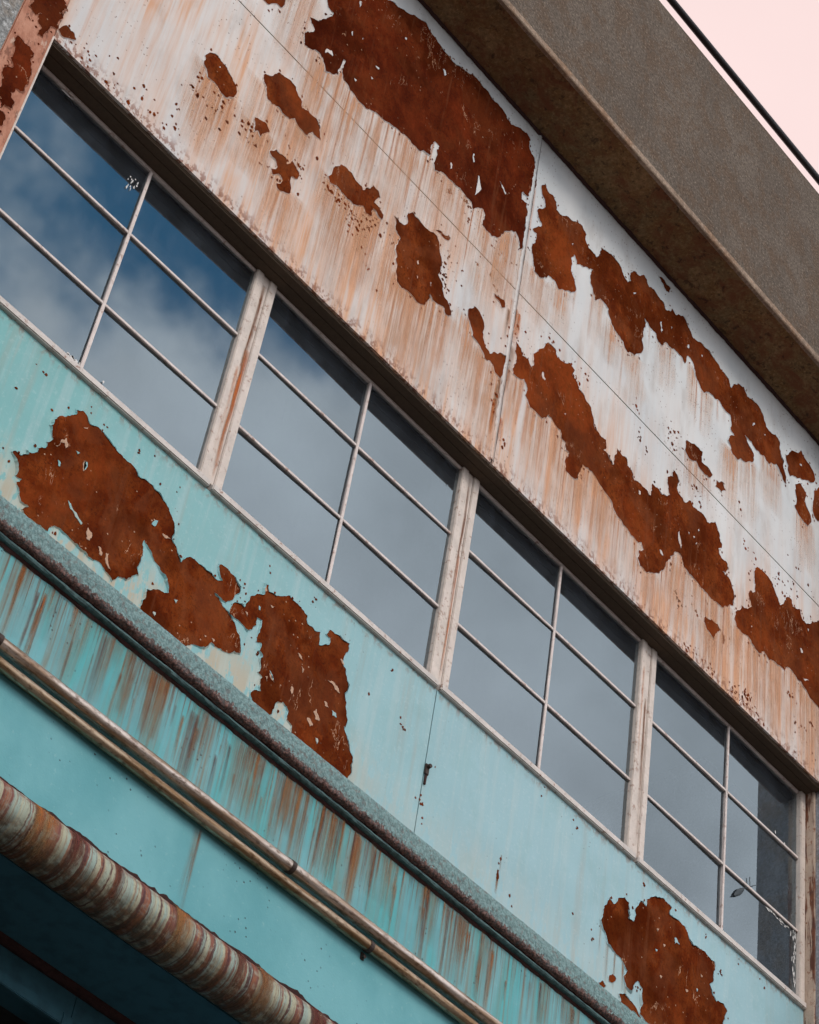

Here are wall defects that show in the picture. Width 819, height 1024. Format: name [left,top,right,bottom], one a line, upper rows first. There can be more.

corrosion [126,84,180,136]
corrosion [181,0,819,708]
corrosion [2,406,353,779]
corrosion [728,681,765,726]
corrosion [270,779,405,891]
corrosion [259,967,274,1003]
corrosion [313,1006,328,1024]